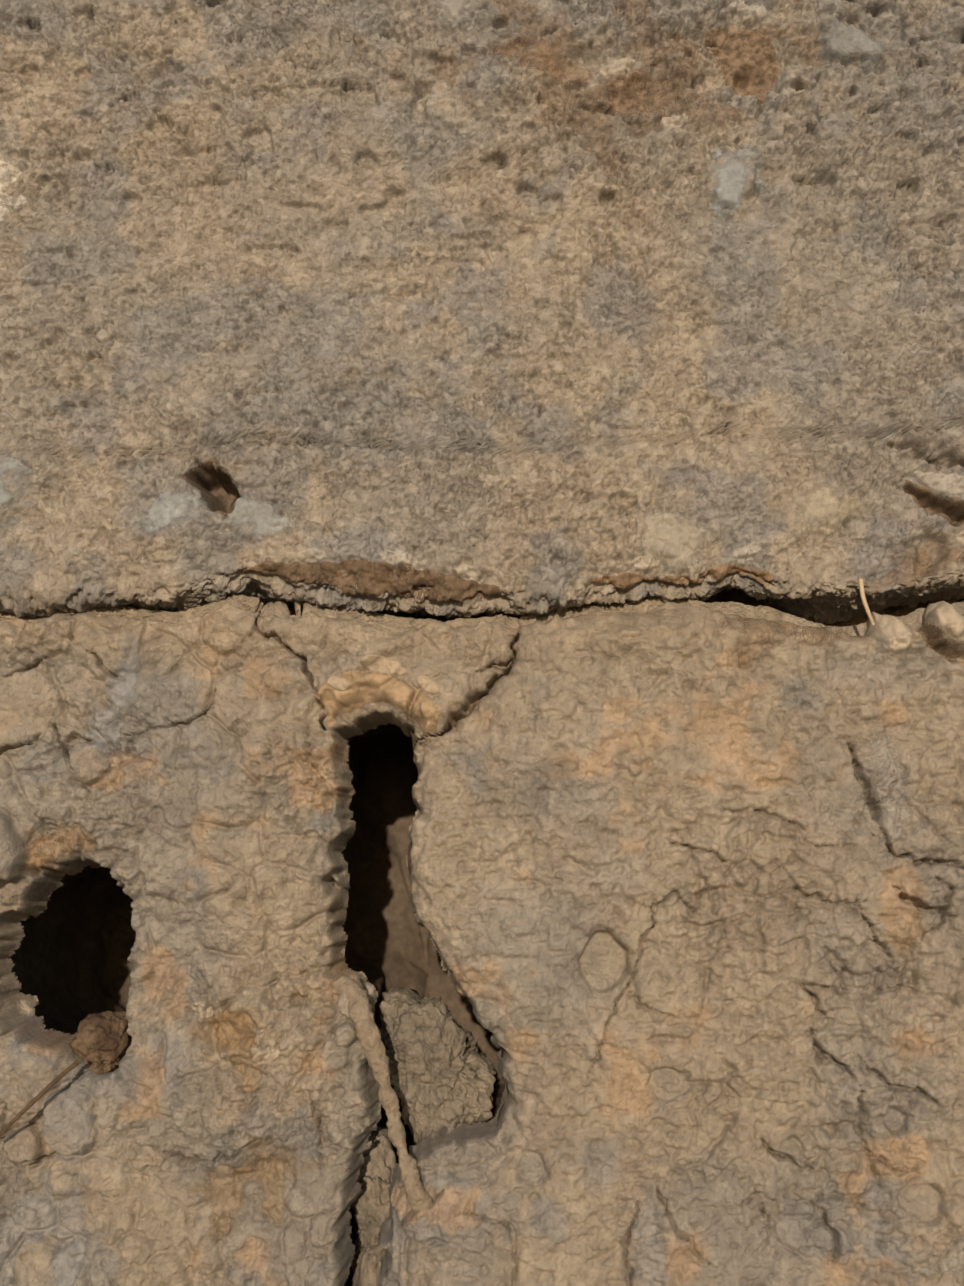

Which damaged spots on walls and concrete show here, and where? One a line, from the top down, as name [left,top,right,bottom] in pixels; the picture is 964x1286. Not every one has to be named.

crack [0,723,95,791]
crack [2,648,125,681]
crack [129,687,216,736]
crack [245,605,325,733]
crack [415,626,522,748]
crack [702,588,957,627]
crack [848,741,964,944]
crack [588,839,730,1080]
crack [782,866,902,976]
crack [799,959,939,1174]
crack [622,1182,712,1286]
crack [759,1137,843,1263]